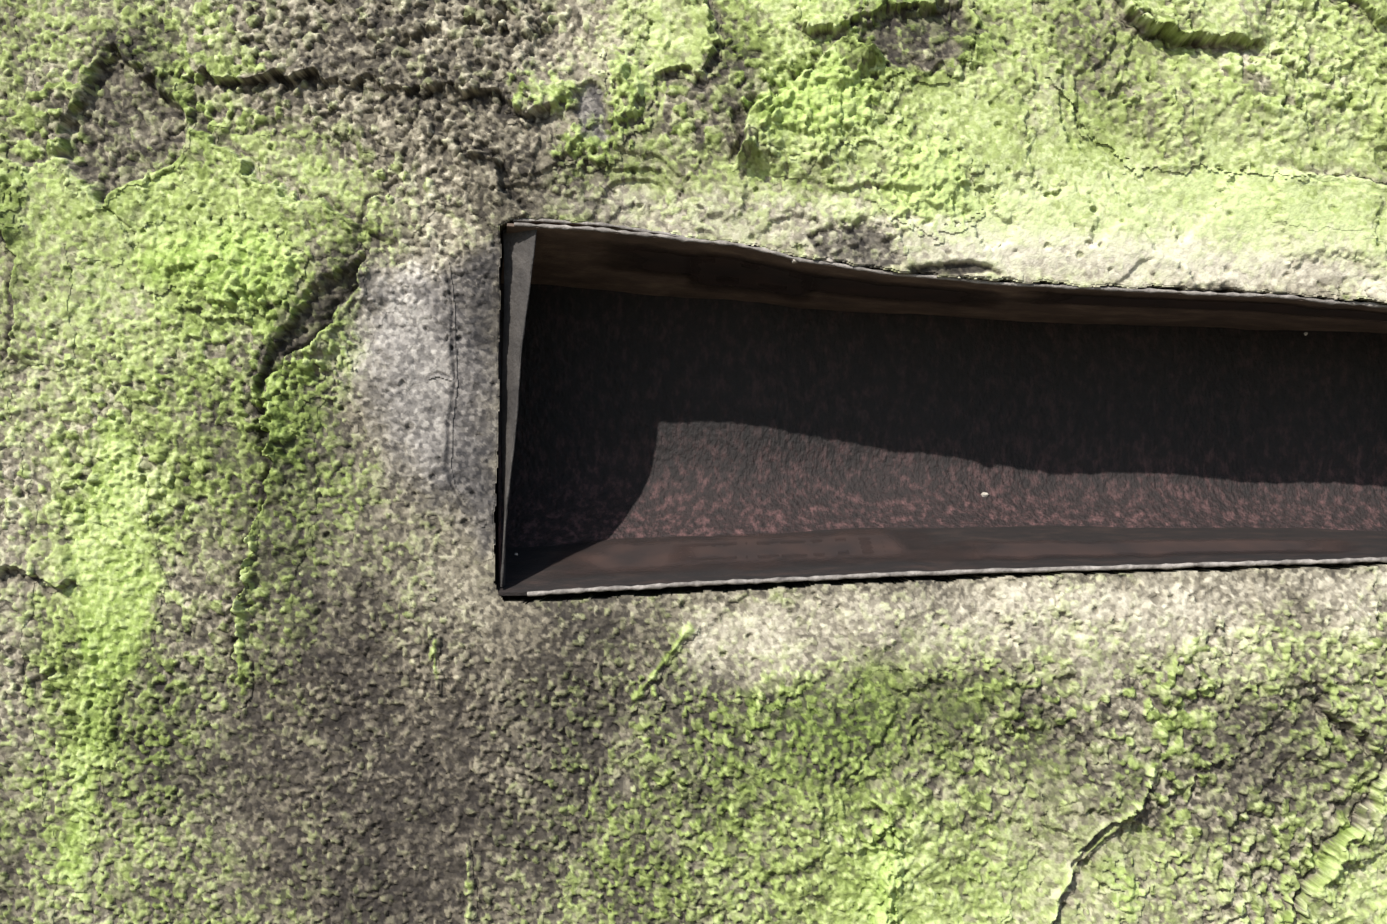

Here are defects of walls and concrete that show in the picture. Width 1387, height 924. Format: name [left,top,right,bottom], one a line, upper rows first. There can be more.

crack [426,259,486,527]
flaking render [998,747,1162,924]